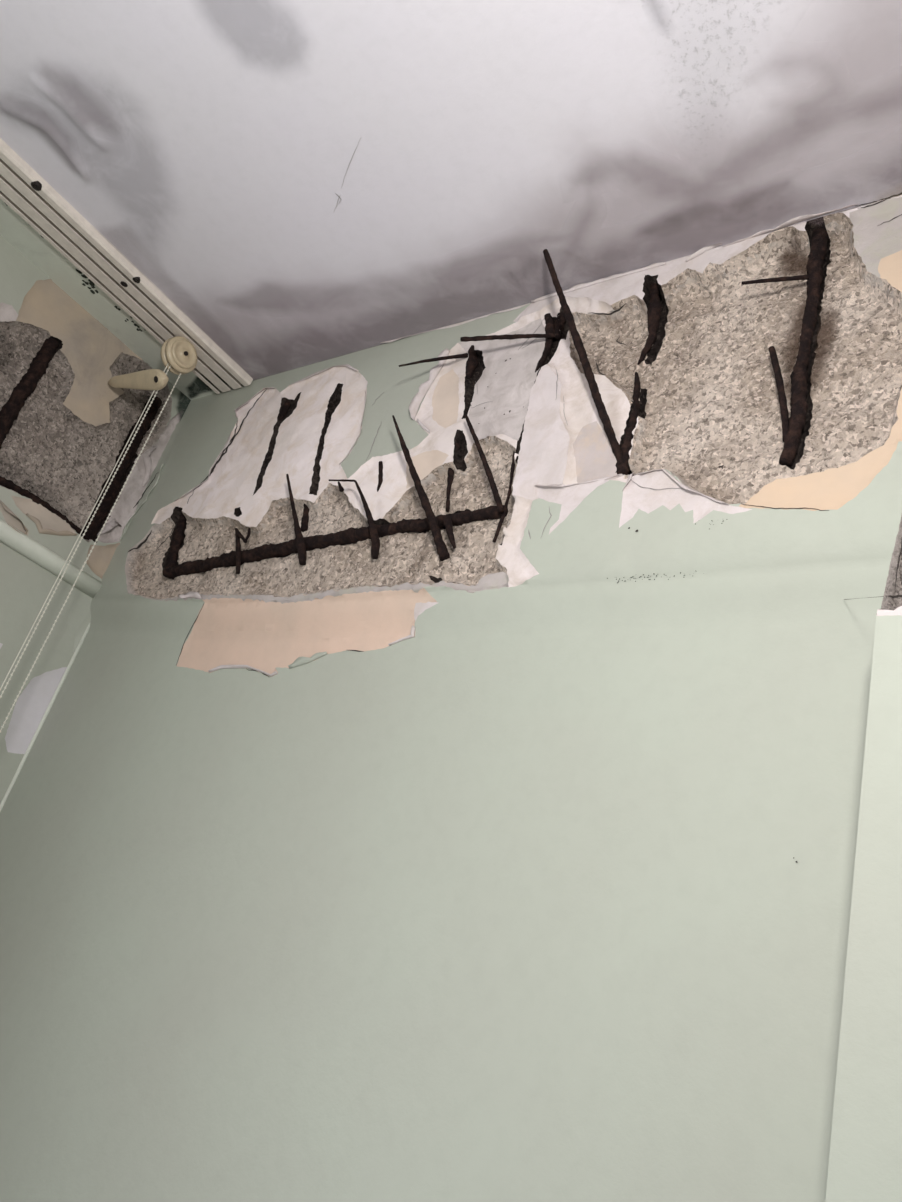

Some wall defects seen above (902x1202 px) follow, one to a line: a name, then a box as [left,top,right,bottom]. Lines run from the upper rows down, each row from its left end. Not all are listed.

rust [781,249,808,273]
rust [786,304,806,391]
rust [810,312,834,383]
spalling [0,195,902,677]